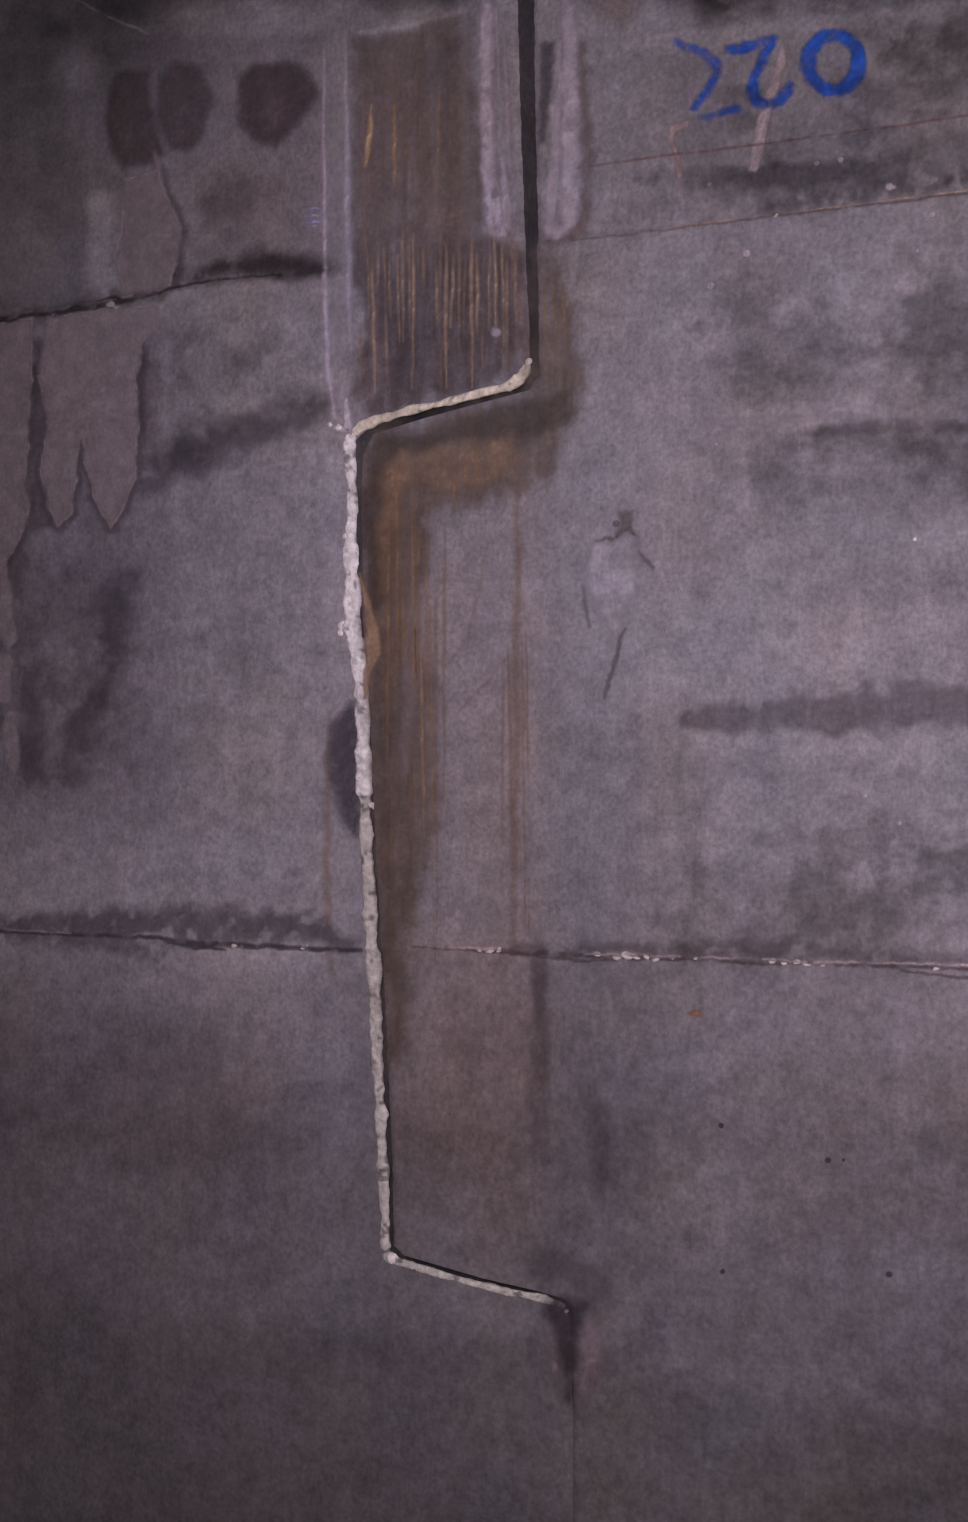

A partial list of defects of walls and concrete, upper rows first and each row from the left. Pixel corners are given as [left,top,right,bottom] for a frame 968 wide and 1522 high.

leakage [107,66,210,166]
crack [0,254,324,324]
leakage [141,54,352,492]
leakage [681,682,968,736]
crack [0,908,362,952]
crack [414,940,968,978]